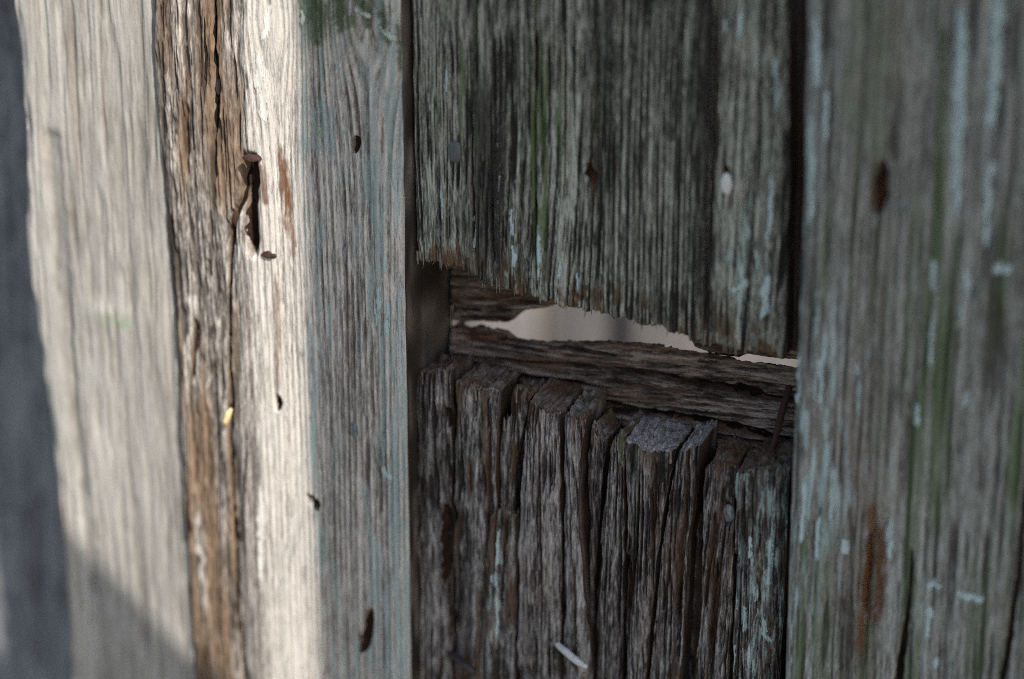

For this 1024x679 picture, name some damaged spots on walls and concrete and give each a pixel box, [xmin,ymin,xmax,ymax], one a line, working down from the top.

crack [204,0,221,178]
rust [279,149,294,259]
rust [856,507,875,649]